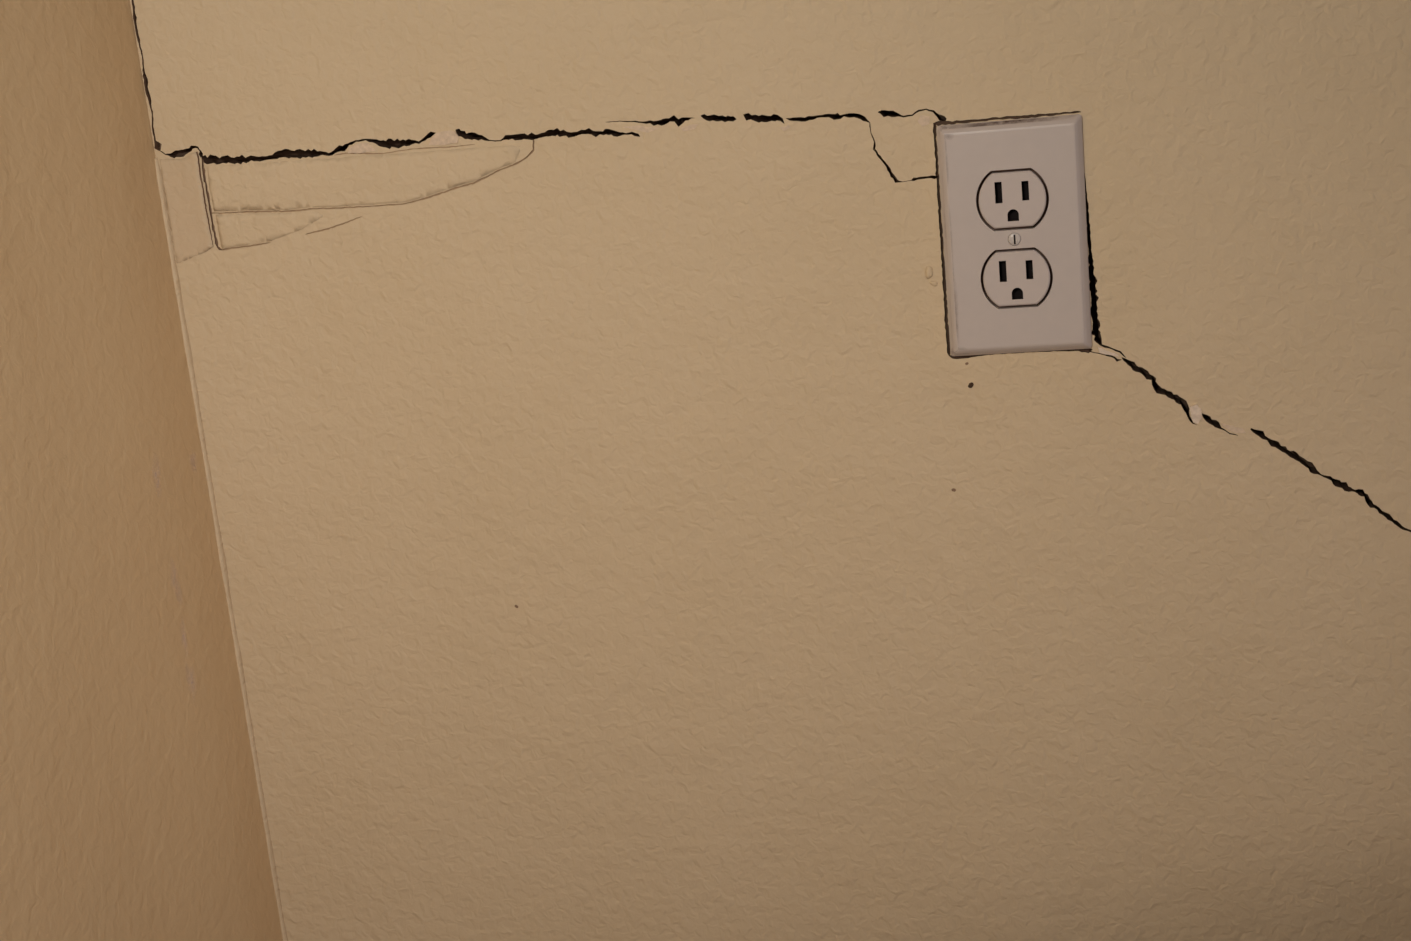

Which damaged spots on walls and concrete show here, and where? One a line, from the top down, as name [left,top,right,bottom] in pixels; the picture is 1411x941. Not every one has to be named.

crack [132,0,947,250]
crack [1084,173,1411,532]